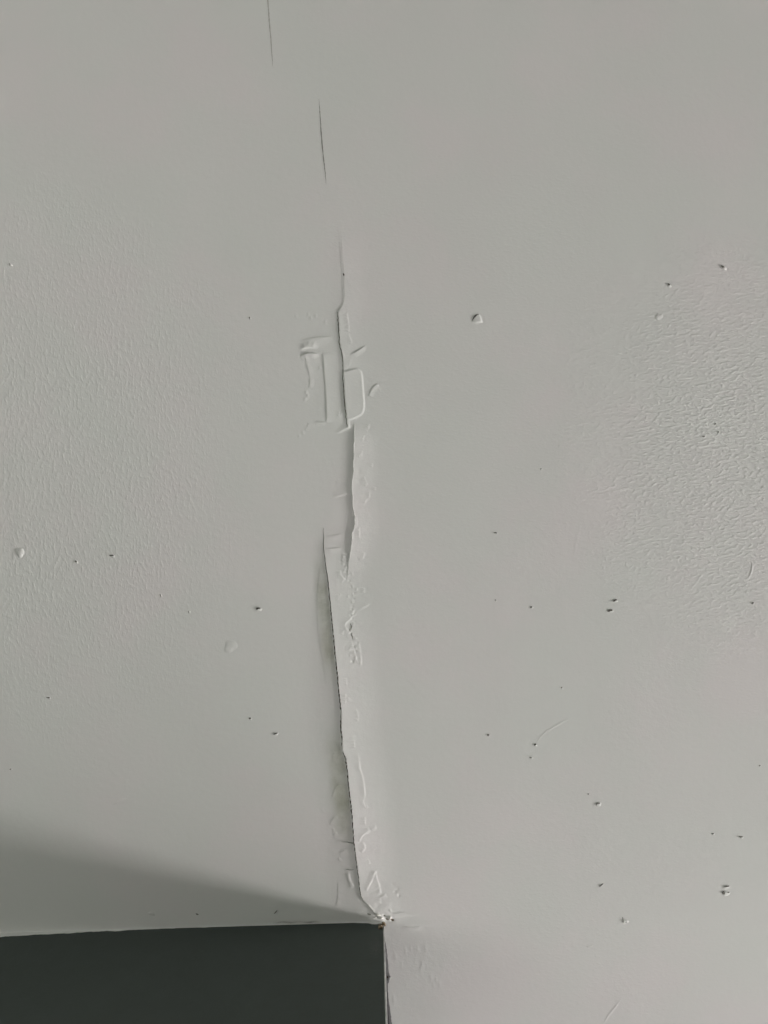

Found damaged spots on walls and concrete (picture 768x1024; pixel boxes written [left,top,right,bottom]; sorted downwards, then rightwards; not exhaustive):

crack [266,0,274,65]
crack [318,105,326,179]
peeling [329,306,381,549]
crack [307,528,411,922]